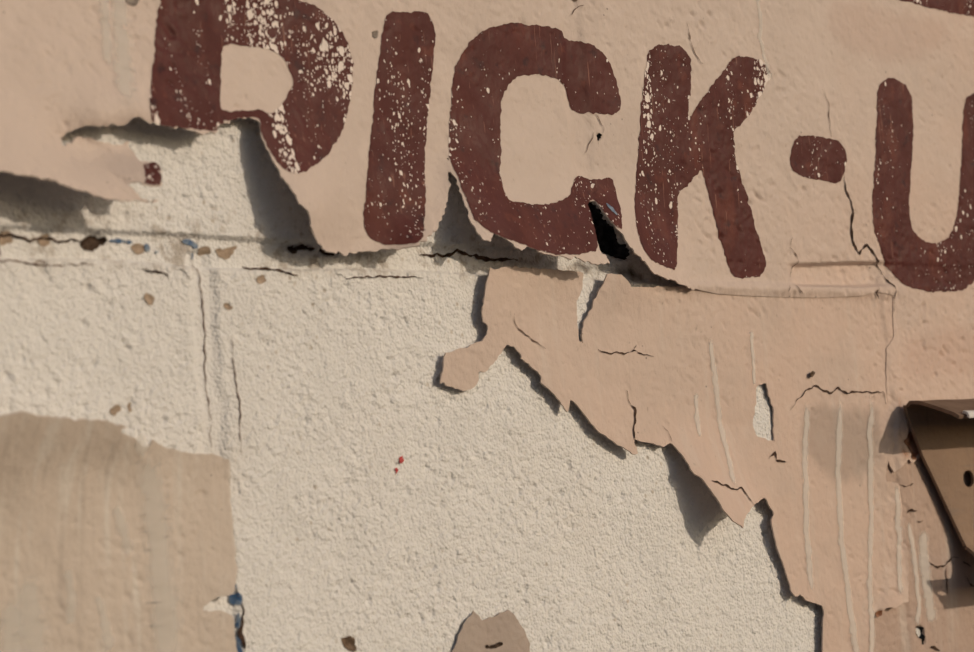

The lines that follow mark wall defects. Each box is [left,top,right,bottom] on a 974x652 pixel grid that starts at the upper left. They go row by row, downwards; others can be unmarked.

peeling [0,45,162,203]
spalling [0,231,13,245]
crack [0,227,94,267]
spalling [80,235,107,251]
spalling [127,240,158,254]
crack [844,175,896,311]
crack [242,266,298,276]
crack [339,249,518,279]
peeling [166,54,909,652]
crack [790,385,886,410]
spalling [904,432,919,459]
peeling [0,402,243,652]